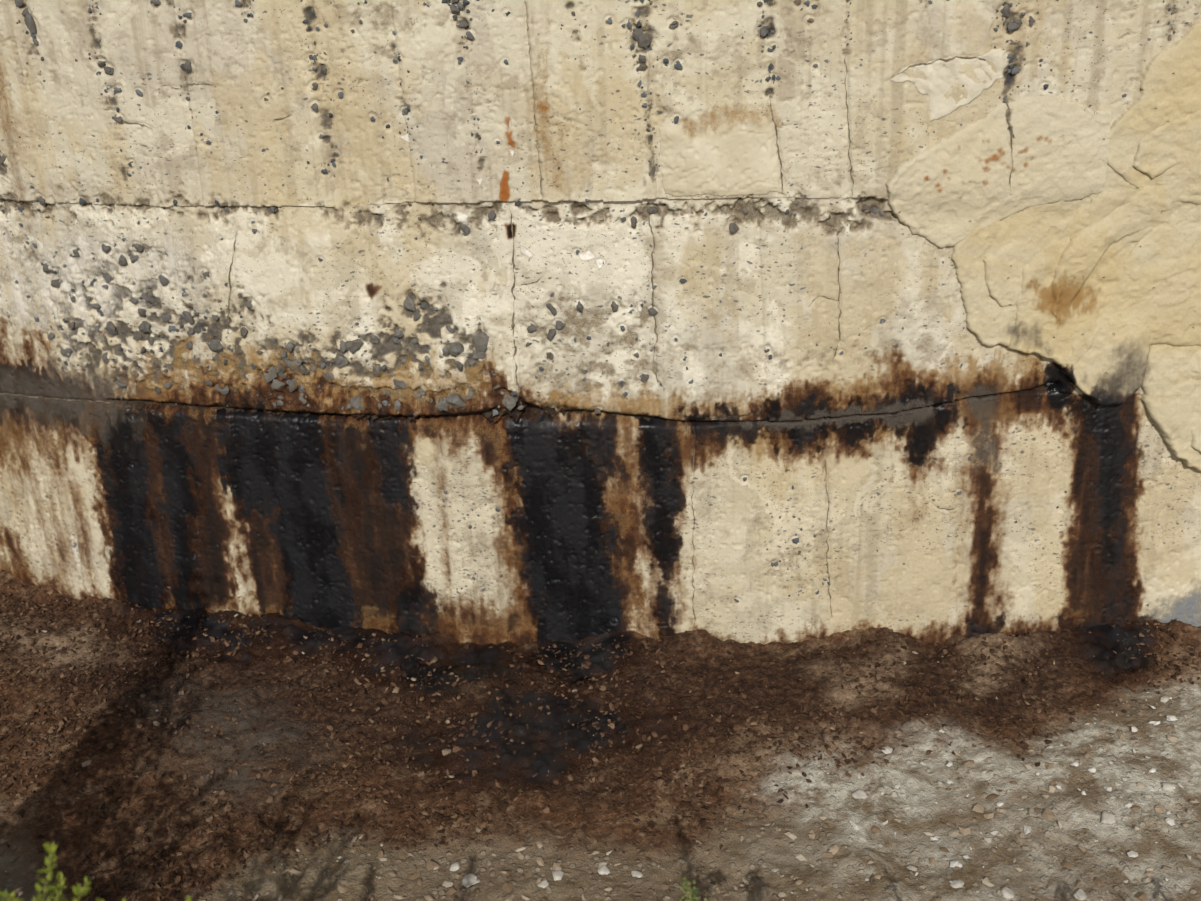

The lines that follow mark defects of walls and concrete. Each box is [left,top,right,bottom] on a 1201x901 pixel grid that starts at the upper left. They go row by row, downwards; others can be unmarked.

spalling [75,2,142,181]
spalling [148,0,219,167]
spalling [300,0,343,177]
spalling [418,0,484,177]
spalling [0,184,524,417]
rust [500,171,510,202]
rust [505,224,516,239]
crack [0,204,775,628]
rust [115,336,746,511]
water stain [0,225,1152,645]
crack [876,382,1052,416]
rust [426,531,528,643]